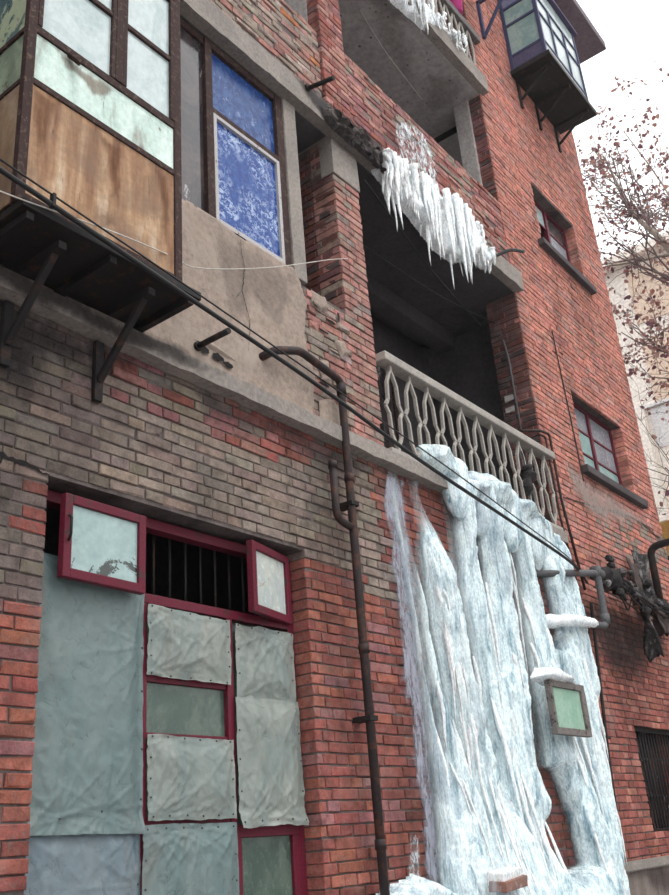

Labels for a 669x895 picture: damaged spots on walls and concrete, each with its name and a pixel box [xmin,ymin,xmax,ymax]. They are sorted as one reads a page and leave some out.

spalling [294,72,387,174]
spalling [306,289,357,434]
crack [0,452,50,476]